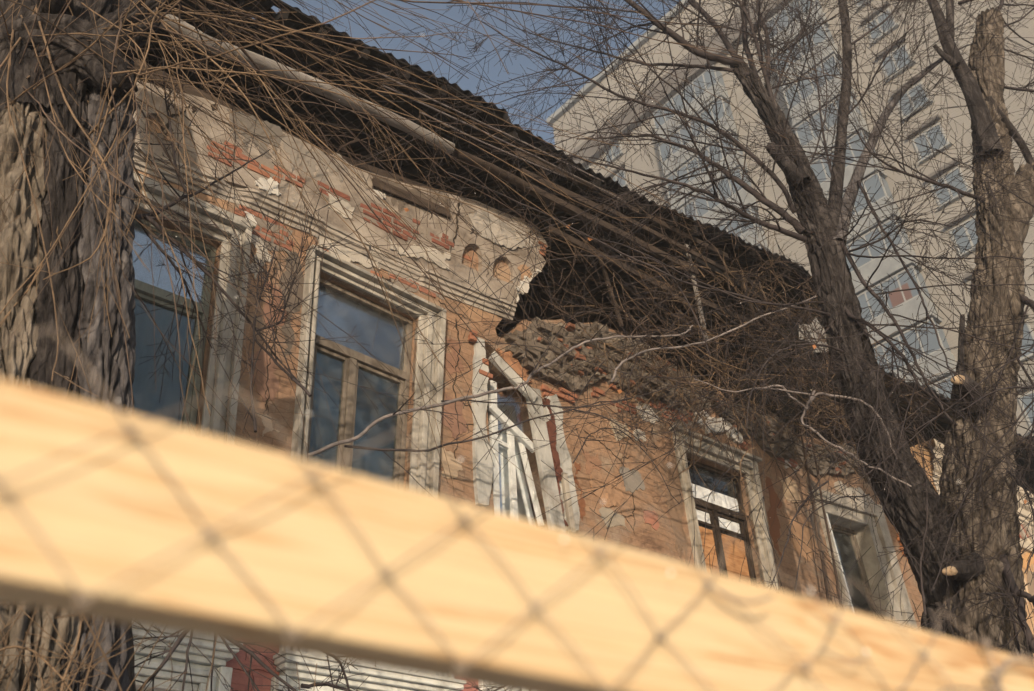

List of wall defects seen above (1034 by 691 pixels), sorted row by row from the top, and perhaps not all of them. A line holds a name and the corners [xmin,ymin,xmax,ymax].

peeling [202,134,472,270]
flaking render [137,170,295,330]
peeling [316,237,441,298]
peeling [493,241,547,303]
spalling [441,392,467,439]
peeling [440,448,463,479]